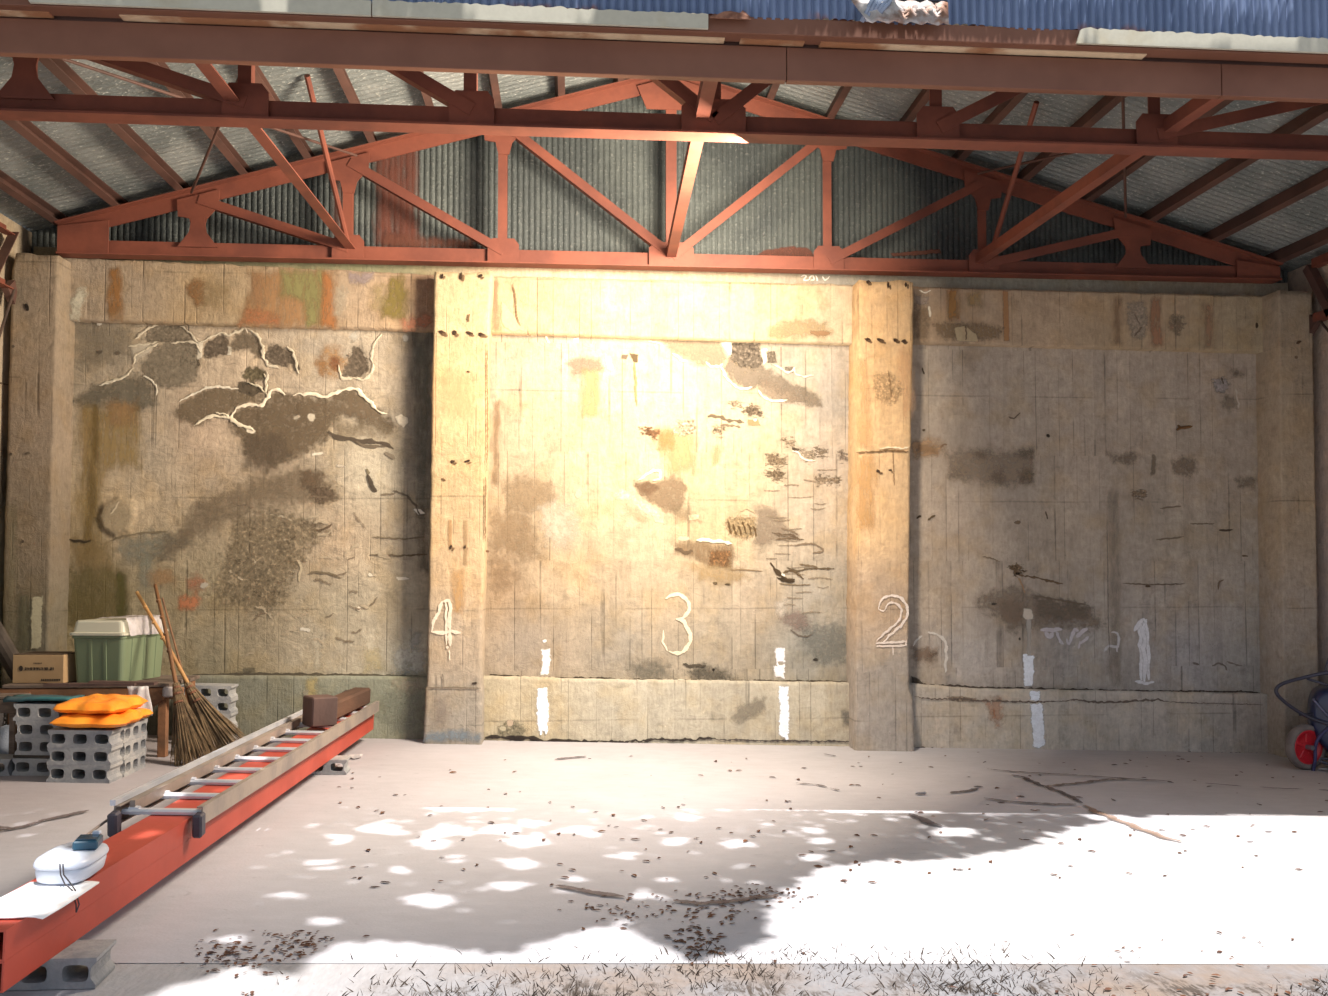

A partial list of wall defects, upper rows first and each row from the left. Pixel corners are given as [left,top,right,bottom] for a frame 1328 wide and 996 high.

spalling [102,324,300,389]
spalling [338,333,382,381]
spalling [722,342,793,373]
water stain [73,333,432,616]
water stain [978,533,1110,656]
crack [911,661,1261,705]
crack [907,813,942,826]
crack [950,769,1182,842]